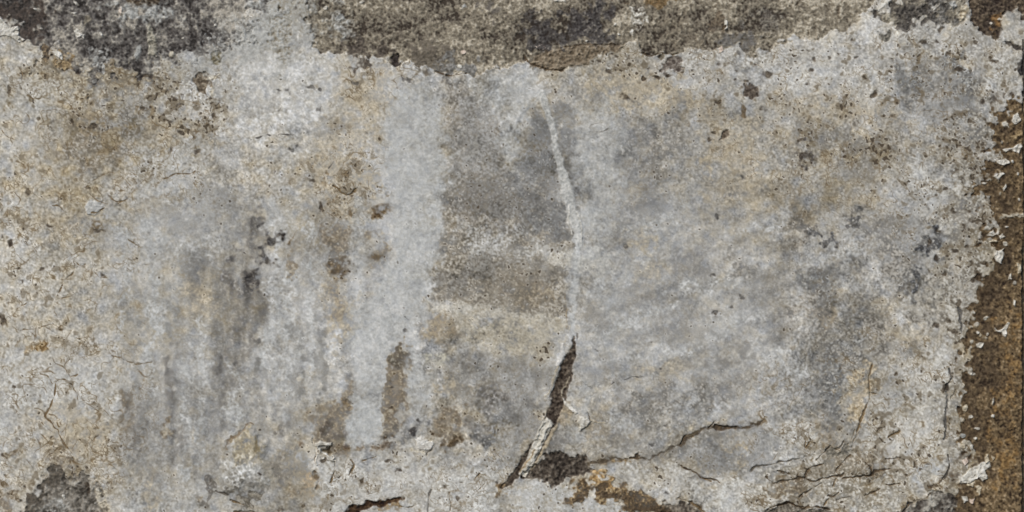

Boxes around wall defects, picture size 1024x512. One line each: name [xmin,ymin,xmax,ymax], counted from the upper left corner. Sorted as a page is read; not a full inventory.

flaking render [0,0,261,88]
hole [263,78,323,96]
damp [95,0,357,512]
damp [267,72,519,500]
flaking render [279,0,1024,512]
crack [582,376,644,421]
crack [586,410,766,484]
crack [749,362,916,507]